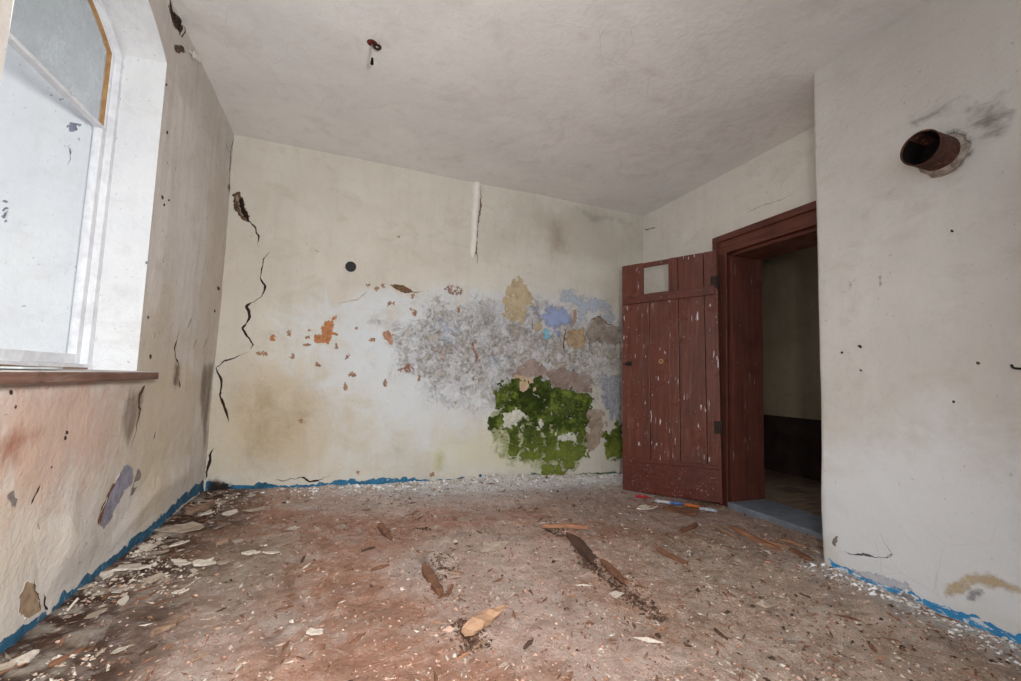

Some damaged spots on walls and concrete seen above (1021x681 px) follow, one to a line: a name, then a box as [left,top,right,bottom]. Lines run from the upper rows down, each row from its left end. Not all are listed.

crack [174,222,269,422]
spalling [303,315,350,360]
spalling [369,330,394,345]
spalling [366,283,421,316]
spalling [501,275,542,331]
spalling [510,310,622,451]
crack [130,385,156,451]
crack [205,450,213,479]
peeling [98,464,141,529]
spalling [18,581,42,620]